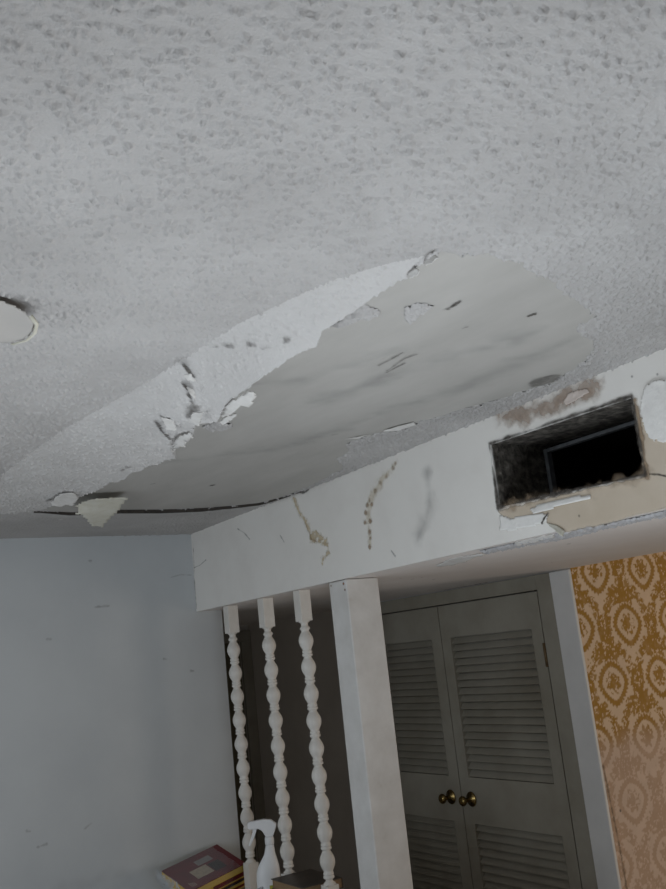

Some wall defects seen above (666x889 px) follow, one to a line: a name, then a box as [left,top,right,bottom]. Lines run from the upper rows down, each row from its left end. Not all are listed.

peeling [46,252,596,528]
peeling [498,374,666,537]
crack [34,509,81,517]
crack [117,491,303,514]
leakage [293,489,330,564]